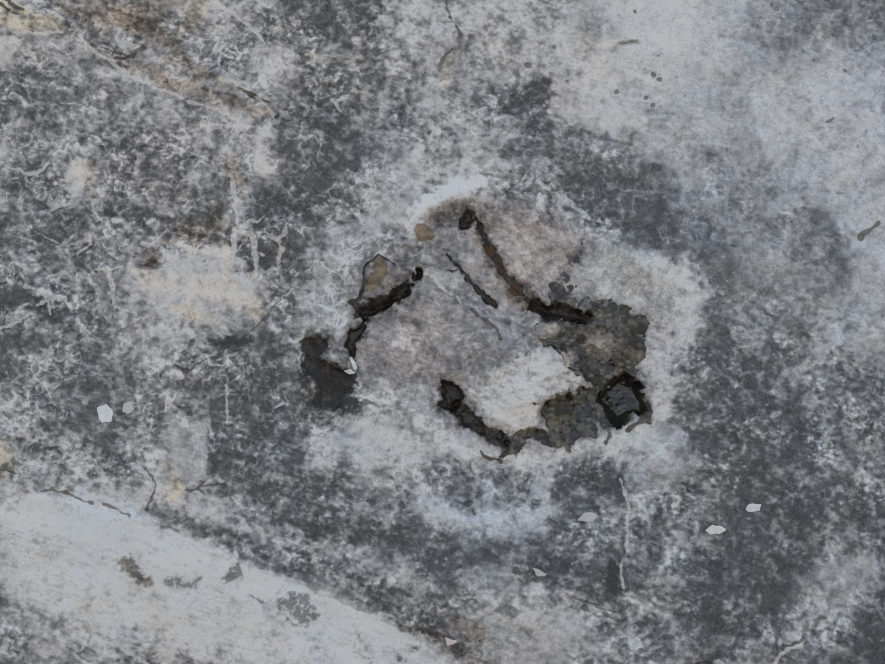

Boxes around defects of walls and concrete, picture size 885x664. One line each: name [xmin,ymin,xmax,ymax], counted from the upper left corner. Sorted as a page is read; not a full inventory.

spalling [337,169,730,481]